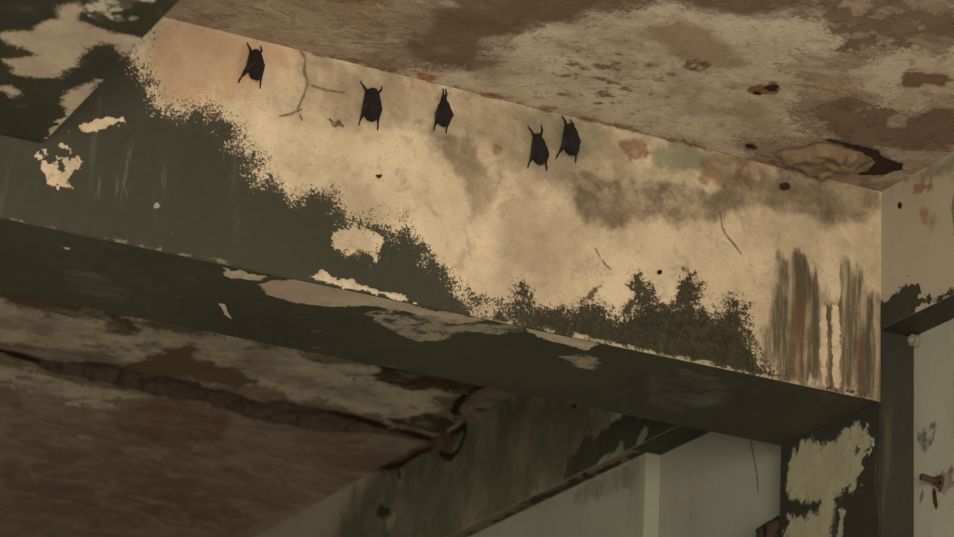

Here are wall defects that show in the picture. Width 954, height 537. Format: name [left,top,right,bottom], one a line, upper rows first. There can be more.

water stain [409,0,650,71]
water stain [694,0,810,14]
peeling [0,0,954,402]
water stain [576,184,627,226]
water stain [704,170,855,222]
flaking render [0,297,471,441]
water stain [486,250,954,401]
crack [376,385,487,480]
peeling [782,420,875,537]